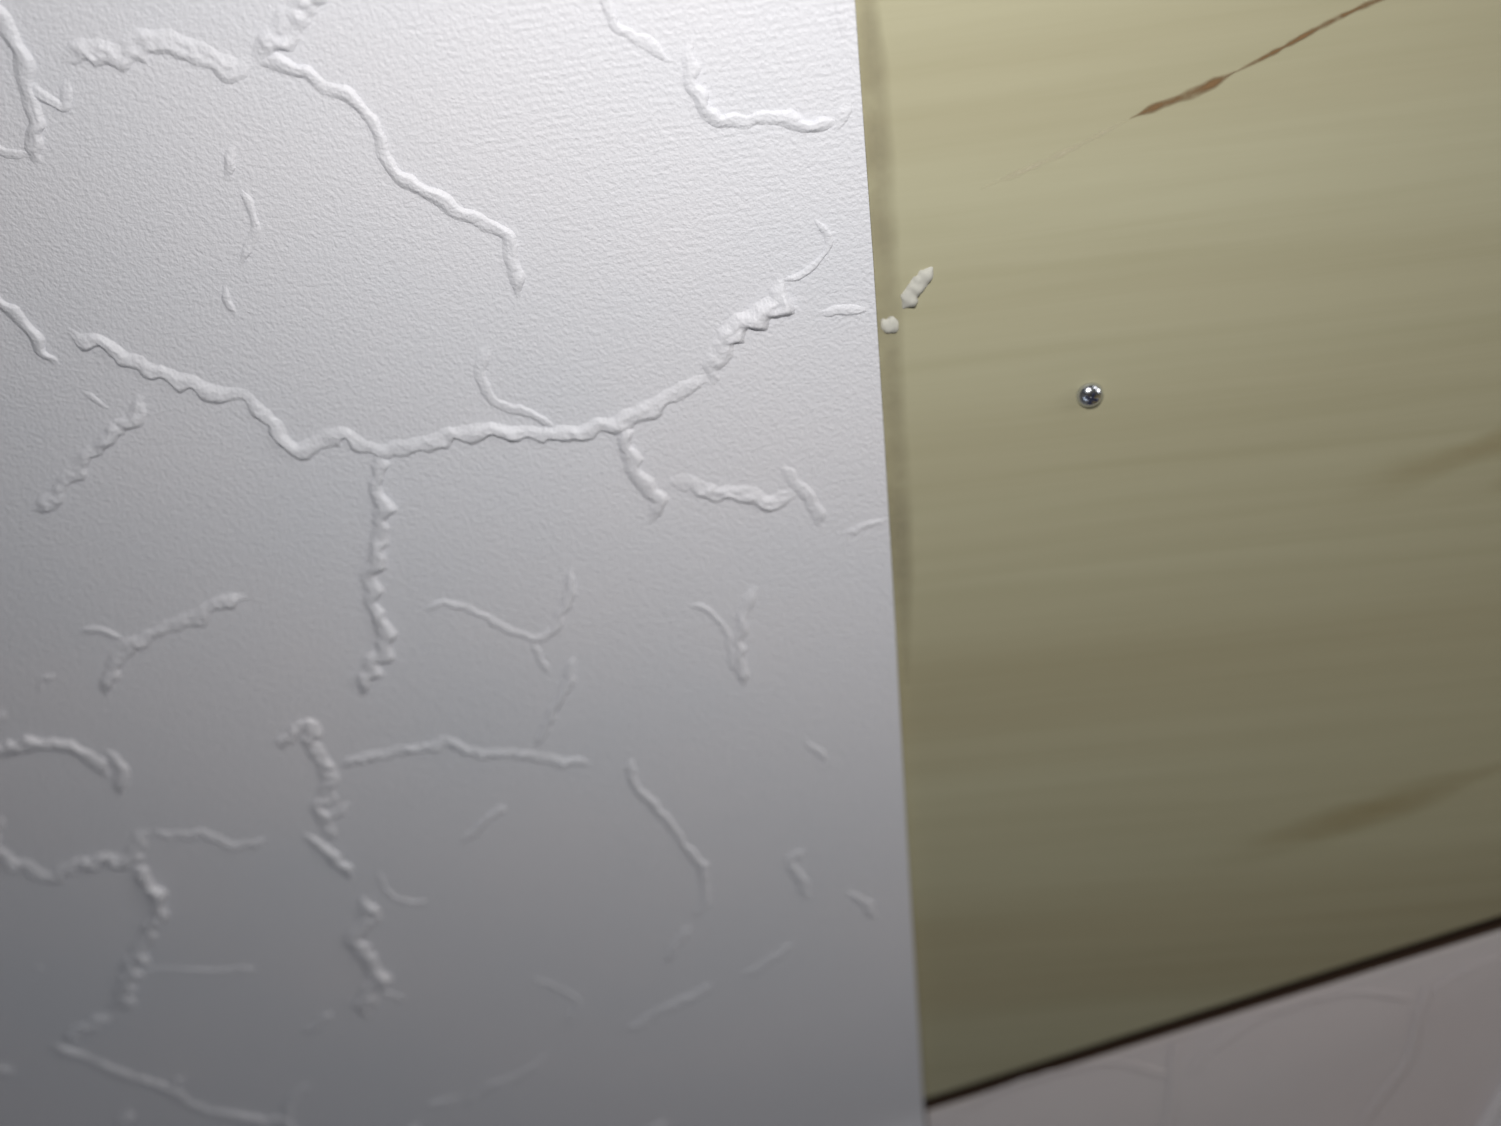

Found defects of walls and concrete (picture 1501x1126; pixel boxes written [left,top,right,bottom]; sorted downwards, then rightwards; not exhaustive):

crack [0,0,526,317]
crack [599,0,853,133]
crack [1139,0,1380,115]
crack [0,219,889,698]
crack [0,706,592,1126]